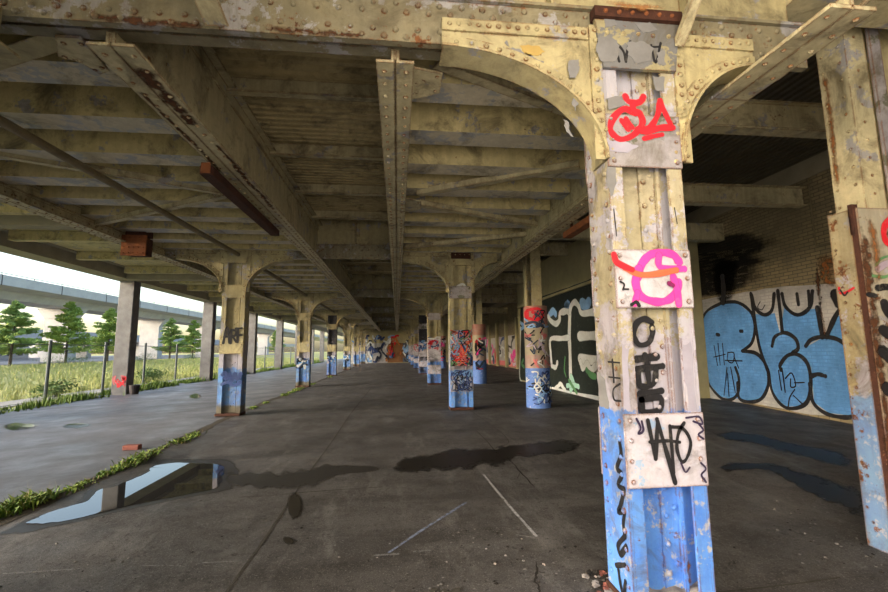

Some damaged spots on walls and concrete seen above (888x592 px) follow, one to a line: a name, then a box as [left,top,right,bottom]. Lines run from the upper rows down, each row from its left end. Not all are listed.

rust [98,14,201,27]
rust [272,26,361,37]
rust [136,69,221,172]
rust [823,78,839,184]
rust [216,145,273,208]
rust [861,221,888,458]
water stain [226,464,378,489]
water stain [394,439,579,473]
water stain [717,432,850,466]
water stain [722,463,864,514]